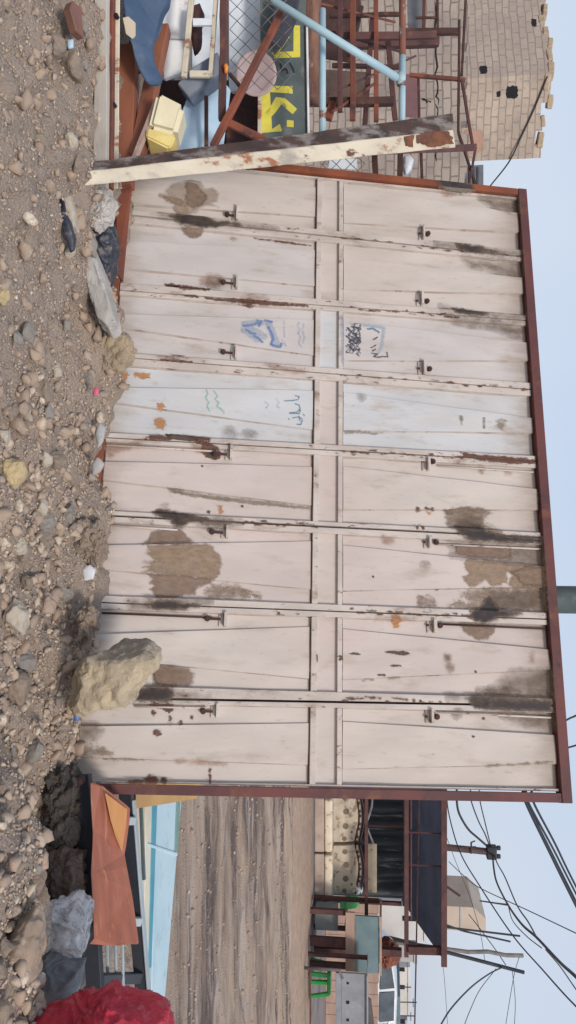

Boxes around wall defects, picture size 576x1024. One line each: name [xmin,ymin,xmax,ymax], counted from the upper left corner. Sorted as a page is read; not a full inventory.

rust [90,113,454,171]
damp [160,180,217,238]
rust [164,282,308,308]
rust [201,443,221,460]
damp [145,519,258,599]
damp [444,507,547,639]
damp [153,665,193,687]
damp [489,697,555,712]